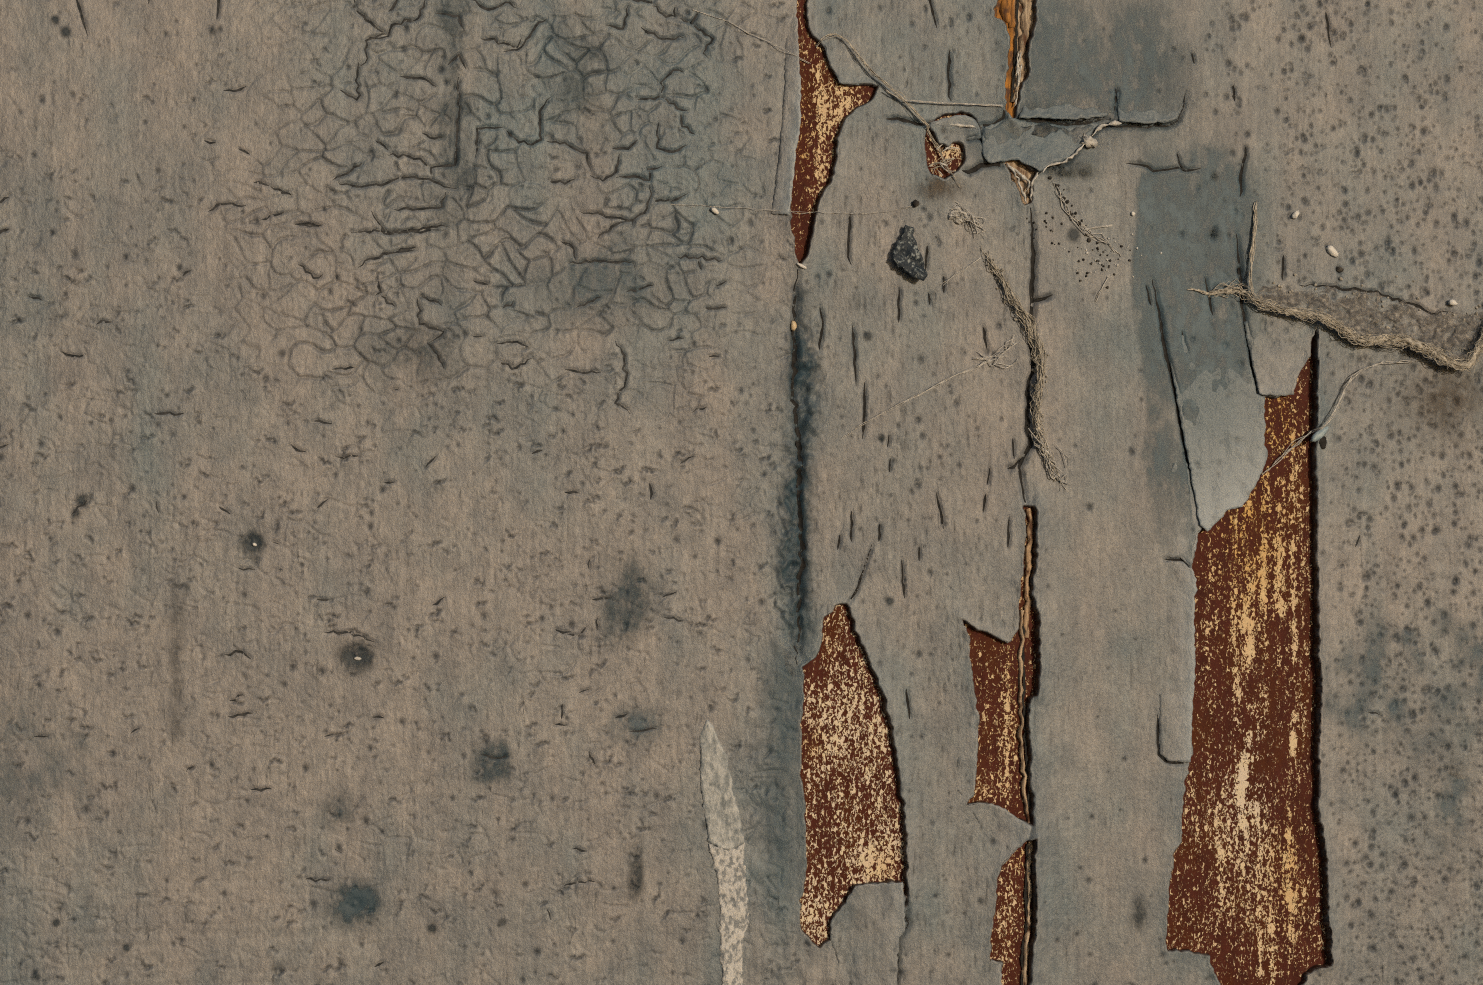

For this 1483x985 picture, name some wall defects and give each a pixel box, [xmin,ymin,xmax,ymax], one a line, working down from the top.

crack [204,0,714,370]
peeling [771,0,875,262]
crack [790,269,944,665]
crack [886,0,952,126]
crack [897,237,945,321]
crack [983,208,1053,547]
crack [962,0,1201,174]
crack [1146,234,1258,473]
crack [1282,255,1454,315]
peeling [799,605,905,985]
peeling [957,507,1036,985]
peeling [1159,316,1327,985]